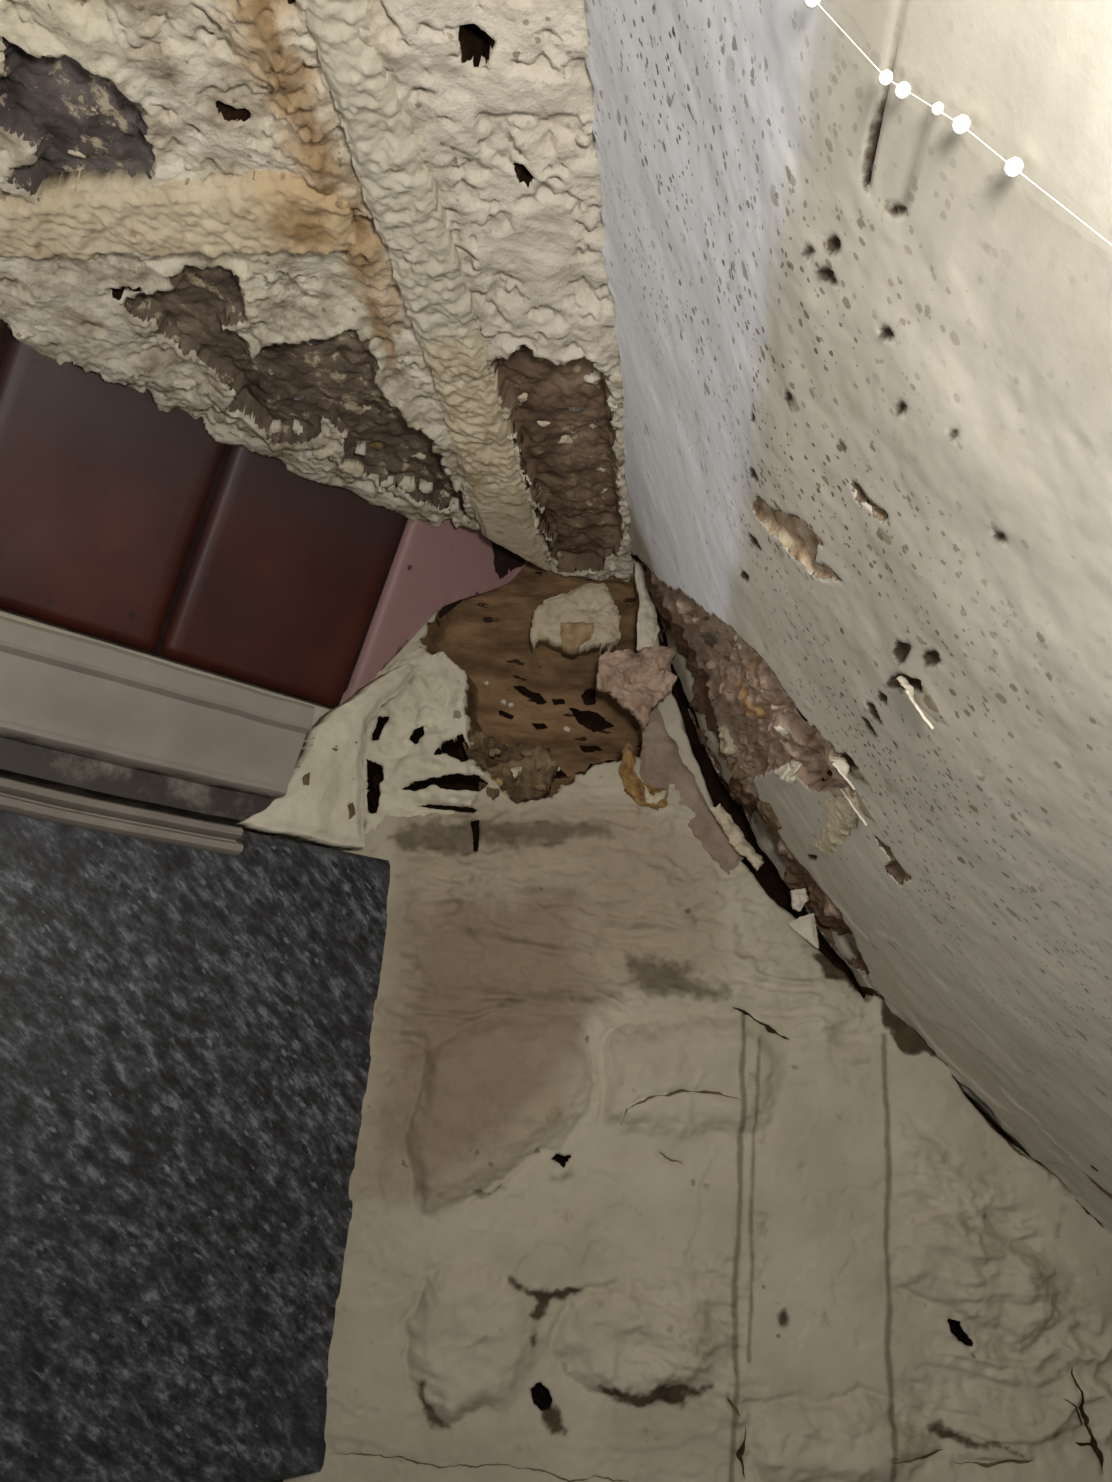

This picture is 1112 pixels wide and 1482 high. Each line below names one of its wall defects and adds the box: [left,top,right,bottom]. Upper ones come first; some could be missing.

spalling [0,37,156,202]
corrosion [252,0,368,276]
spalling [124,265,472,526]
spalling [491,344,911,982]
spalling [347,647,488,834]
leakage [879,994,936,1056]
leakage [509,1278,581,1319]
crack [330,1452,628,1482]
leakage [542,1405,566,1434]
leakage [601,1385,713,1407]
crack [727,1398,746,1480]
crack [1063,1370,1104,1473]